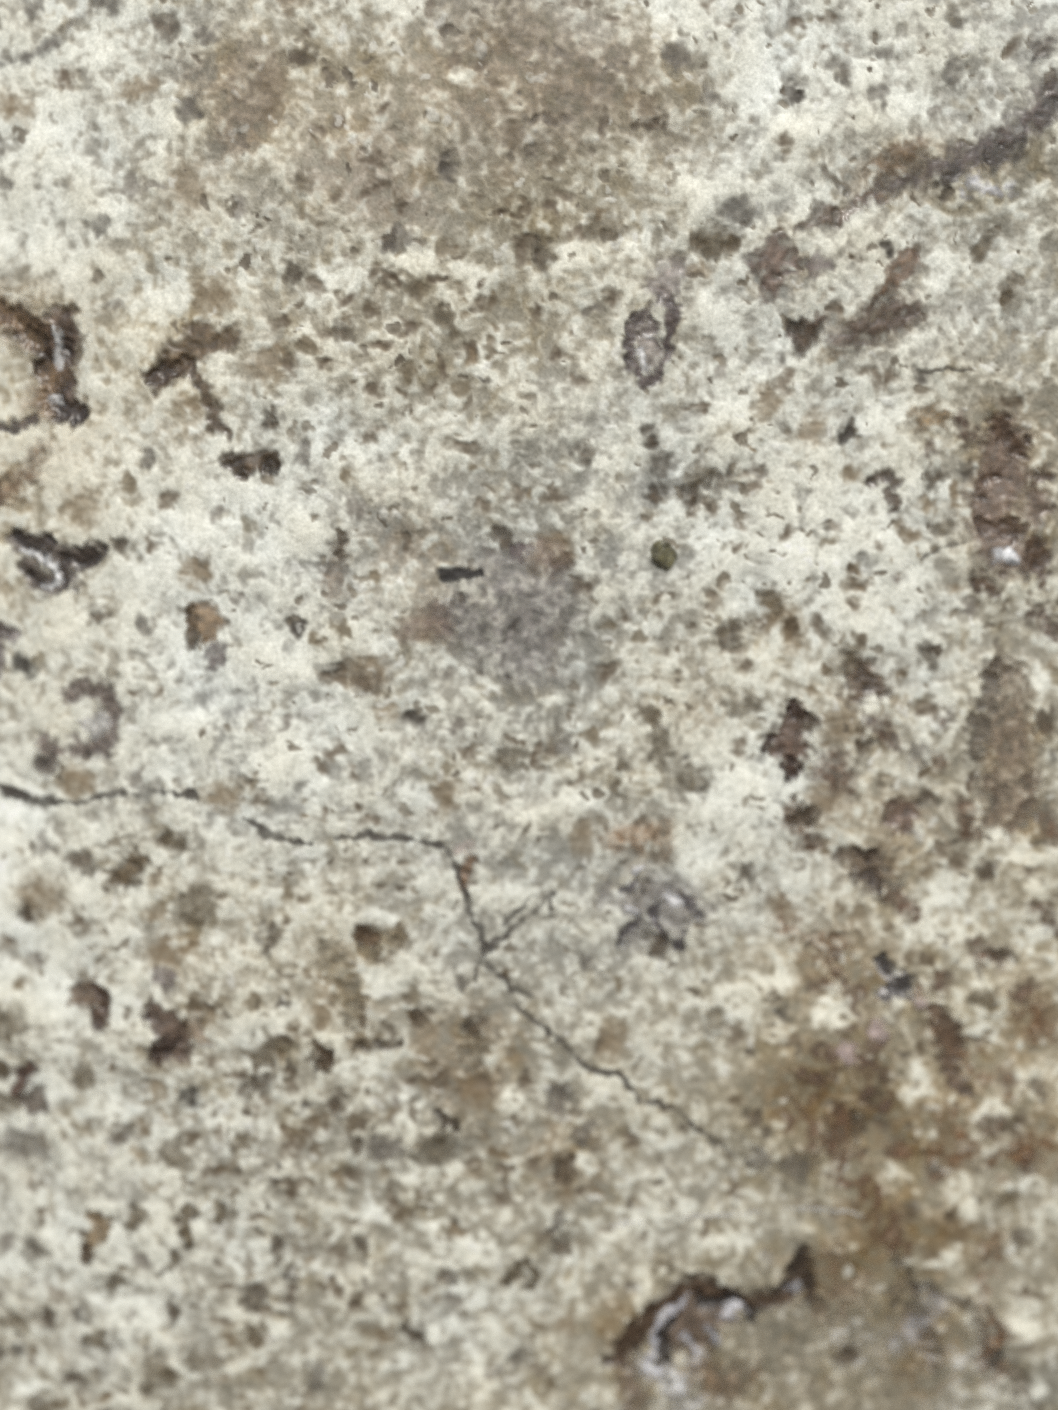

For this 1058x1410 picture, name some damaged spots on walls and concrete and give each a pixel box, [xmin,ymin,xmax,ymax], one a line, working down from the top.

crack [0,784,199,806]
crack [246,819,710,1139]
spalling [603,1245,820,1409]